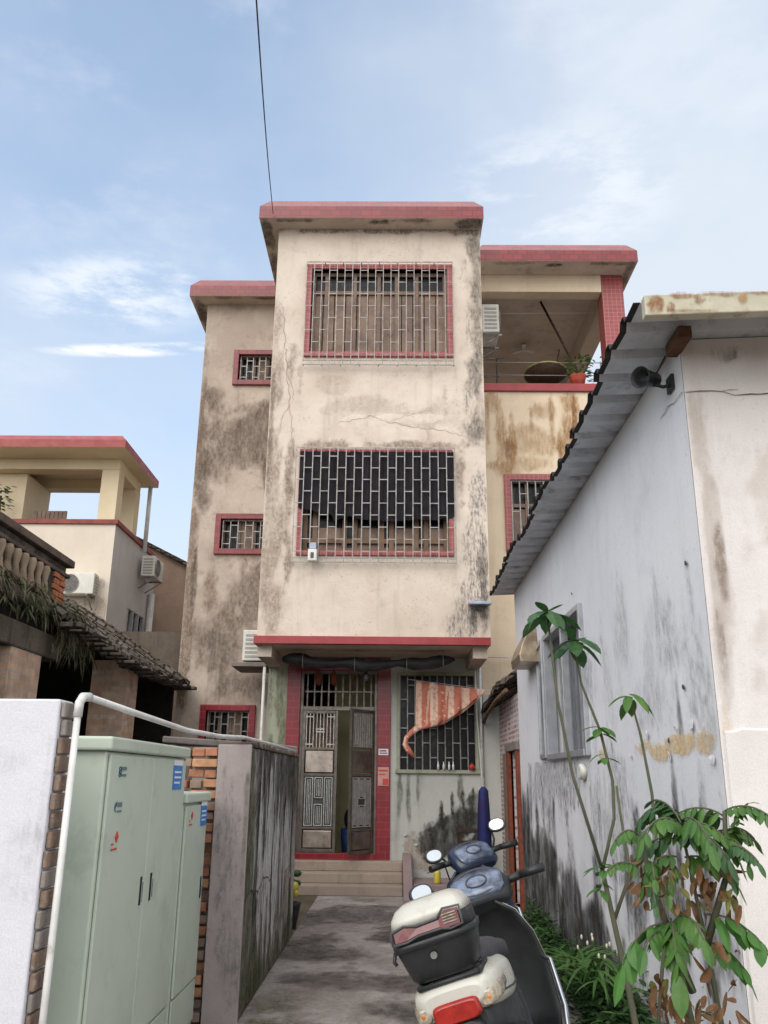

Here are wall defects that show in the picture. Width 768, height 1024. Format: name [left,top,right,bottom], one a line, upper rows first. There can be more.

crack [280,306,294,455]
crack [340,410,464,442]
damp [550,396,578,452]
crack [661,389,768,417]
damp [179,383,279,695]
mould [449,475,489,637]
damp [247,751,299,954]
damp [419,786,478,859]
damp [521,760,646,1022]
damp [613,809,685,948]
flaking render [630,720,768,1024]